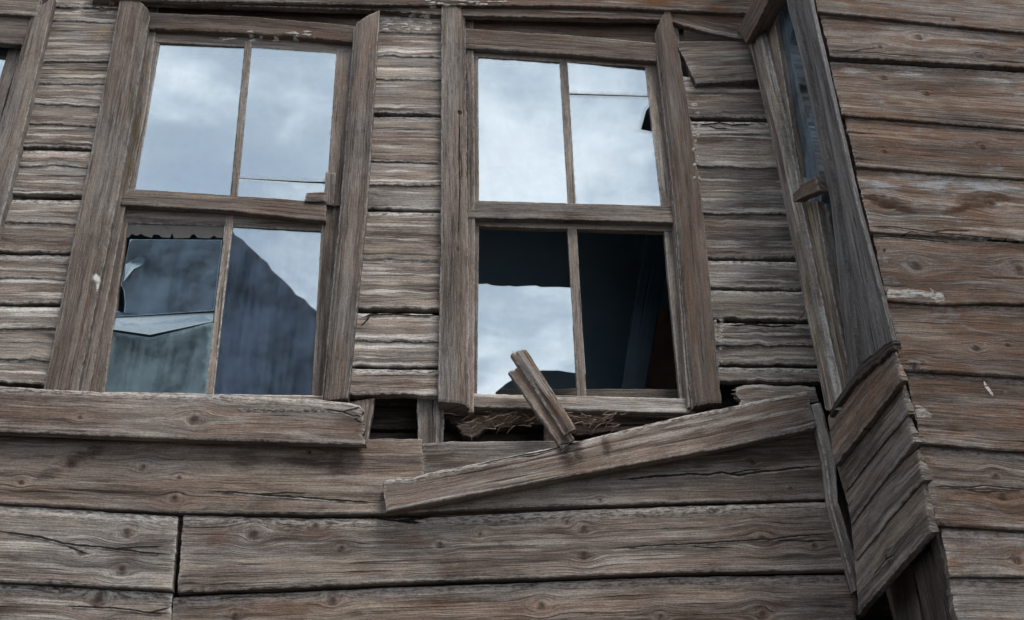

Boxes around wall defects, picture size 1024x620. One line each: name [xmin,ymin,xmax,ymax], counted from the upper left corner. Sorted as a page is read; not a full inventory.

crack [619,459,826,481]
crack [215,491,423,526]
crack [2,531,172,556]